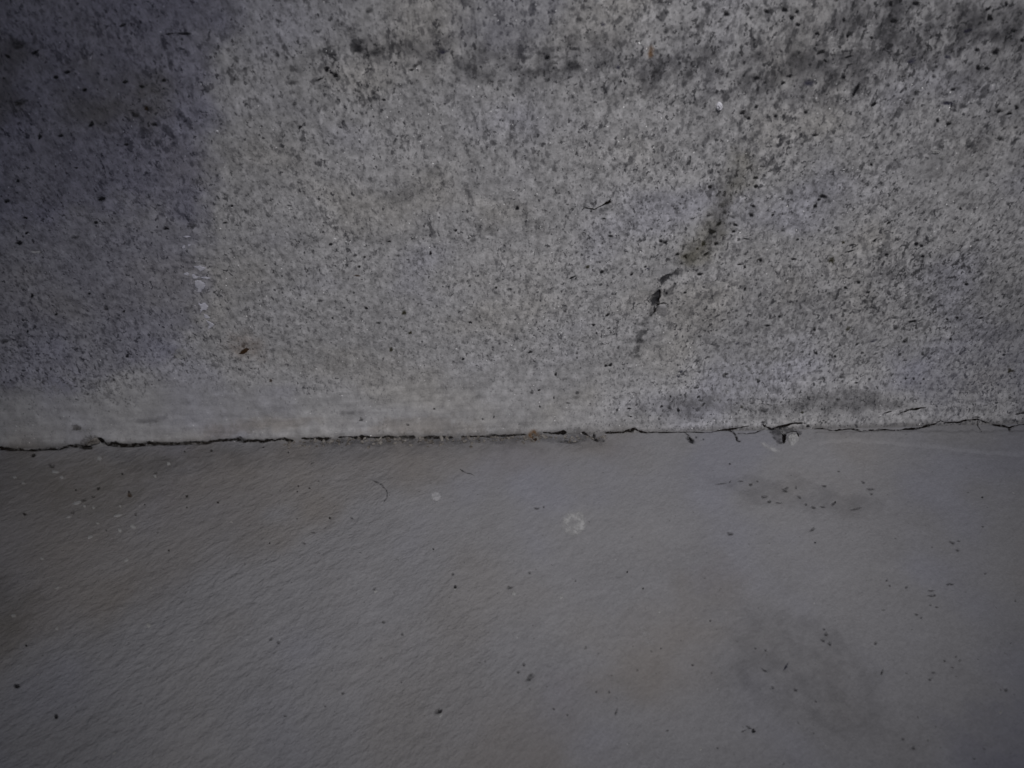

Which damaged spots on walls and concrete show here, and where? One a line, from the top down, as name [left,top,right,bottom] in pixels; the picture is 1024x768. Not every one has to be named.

crack [0,407,1024,451]